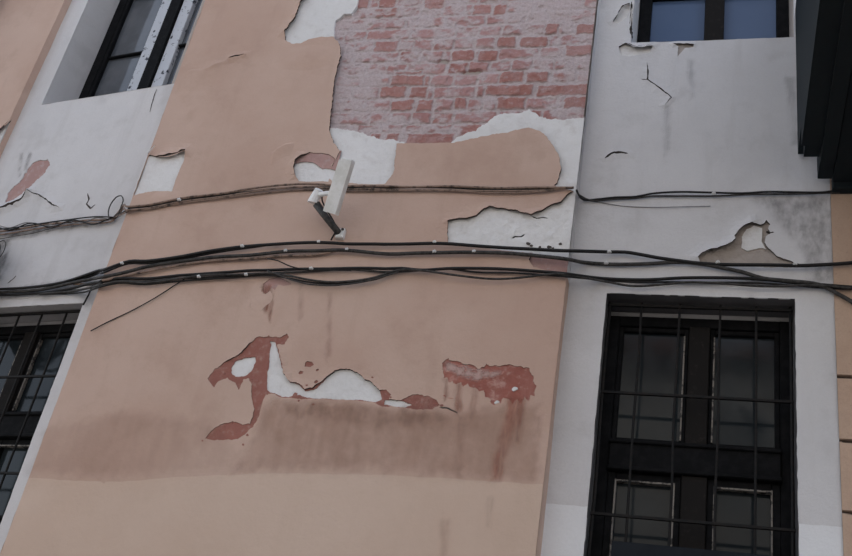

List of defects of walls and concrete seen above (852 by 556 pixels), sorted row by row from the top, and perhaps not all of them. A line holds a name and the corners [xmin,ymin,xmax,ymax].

spalling [612,3,653,56]
flaking render [285,0,597,272]
peeling [6,160,50,202]
peeling [134,145,185,195]
spalling [698,221,798,268]
peeling [202,334,457,445]
peeling [442,358,536,405]